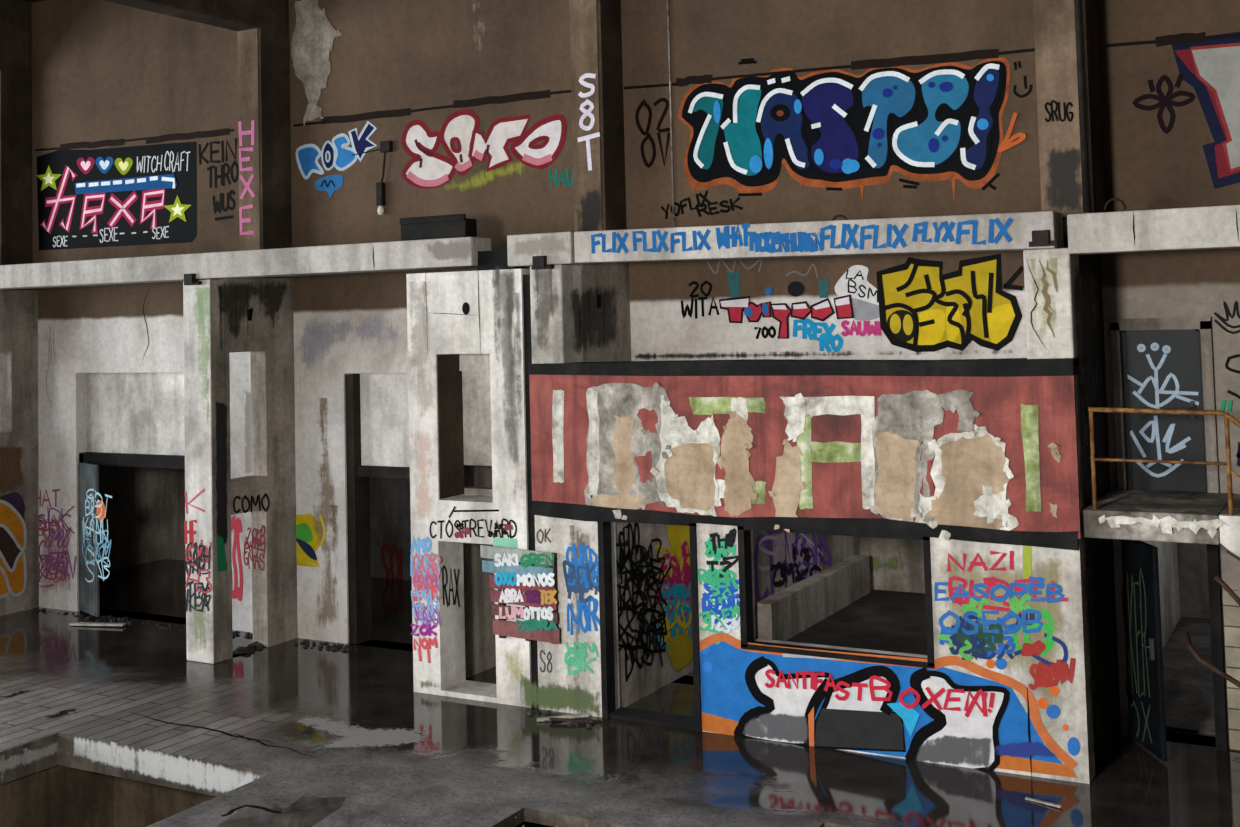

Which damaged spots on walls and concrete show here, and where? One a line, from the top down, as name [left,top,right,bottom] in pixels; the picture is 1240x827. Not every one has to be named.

flaking render [292,0,342,126]
peeling [584,382,806,533]
peeling [871,389,1019,541]
peeling [1048,442,1061,462]